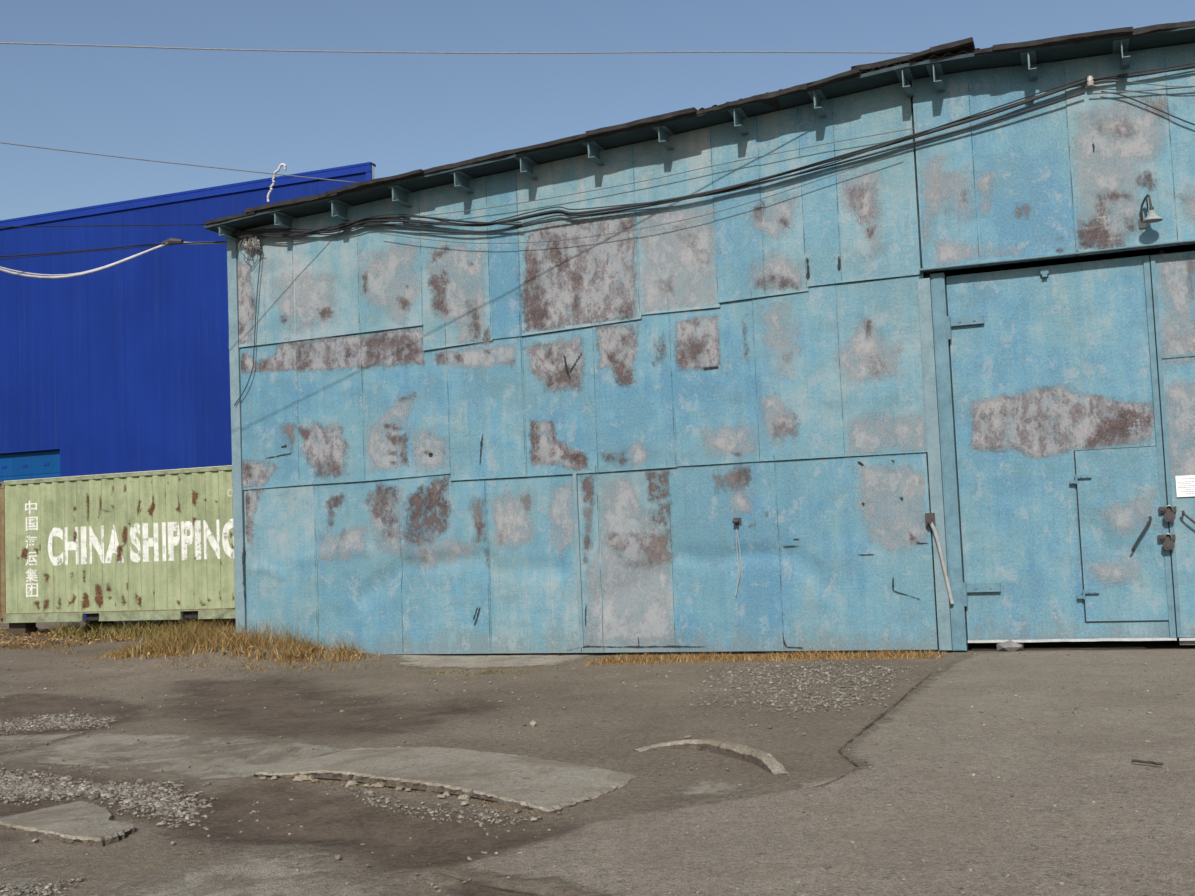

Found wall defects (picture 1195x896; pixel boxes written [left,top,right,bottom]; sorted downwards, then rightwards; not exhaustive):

peeling [754,199,794,238]
peeling [1076,100,1168,244]
peeling [238,210,720,391]
peeling [1161,259,1195,363]
peeling [298,422,349,476]
peeling [972,384,1195,476]
peeling [321,491,470,565]
peeling [586,479,673,643]
crack [810,673,931,788]